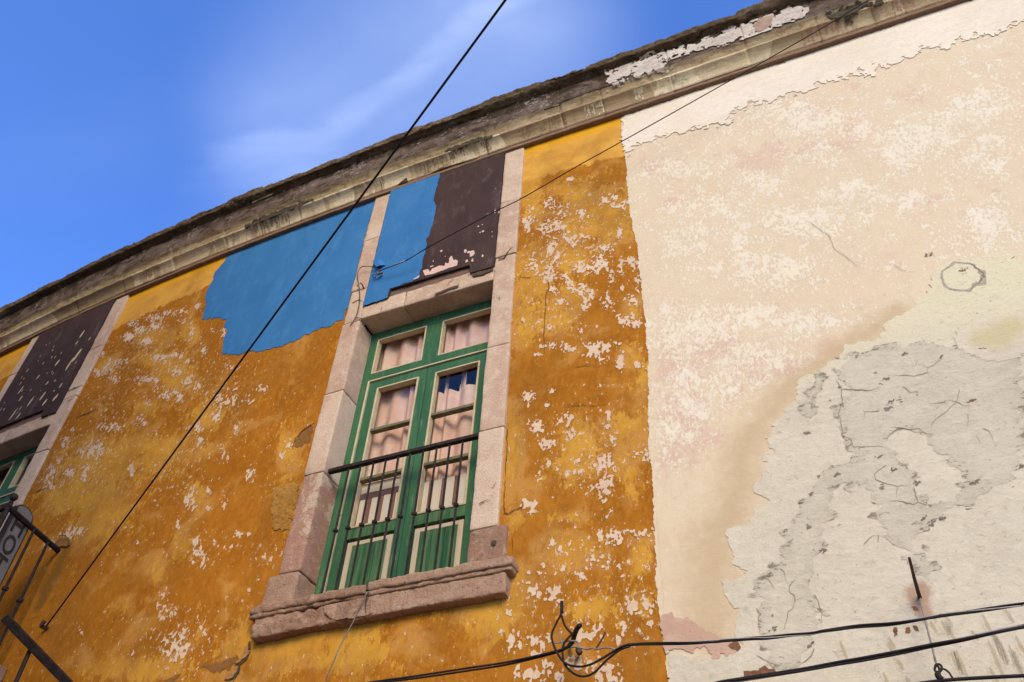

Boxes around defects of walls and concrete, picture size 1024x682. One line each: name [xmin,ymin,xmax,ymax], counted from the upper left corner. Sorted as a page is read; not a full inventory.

peeling [604,0,1024,157]
peeling [414,249,484,279]
peeling [519,196,647,373]
crack [940,261,987,292]
peeling [0,330,91,420]
peeling [39,303,208,494]
peeling [185,384,269,464]
spalling [497,252,1024,682]
crack [833,359,993,505]
peeling [189,536,216,572]
peeling [159,614,239,682]
corrosion [893,575,942,636]